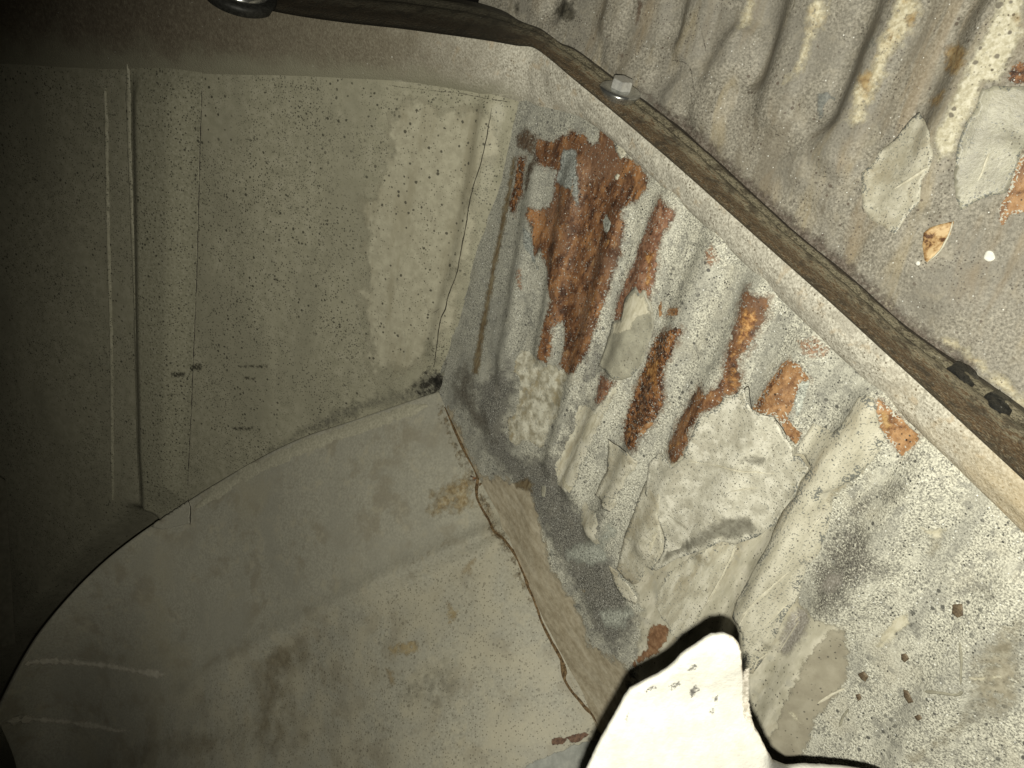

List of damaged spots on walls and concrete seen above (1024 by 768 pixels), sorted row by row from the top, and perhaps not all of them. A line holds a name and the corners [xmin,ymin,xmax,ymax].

crack [392,85,507,367]
corrosion [472,129,682,450]
peeling [861,112,933,234]
peeling [954,86,1024,210]
corrosion [668,292,769,463]
corrosion [753,360,810,444]
corrosion [876,400,919,456]
crack [444,407,598,725]
corrosion [633,624,669,668]
peeling [474,286,885,768]